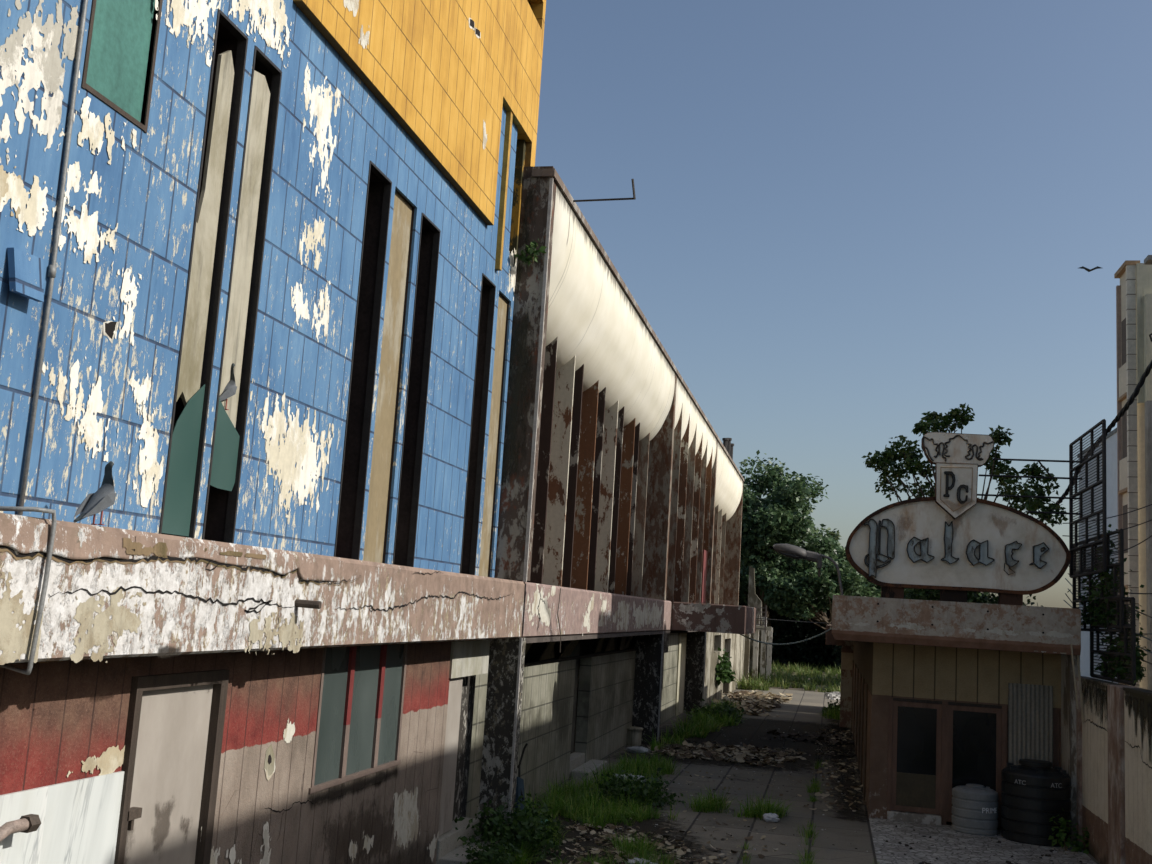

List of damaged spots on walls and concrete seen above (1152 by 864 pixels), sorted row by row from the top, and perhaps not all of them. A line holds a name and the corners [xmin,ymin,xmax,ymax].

peeling [155,0,294,68]
peeling [0,0,142,346]
peeling [299,62,341,271]
peeling [291,281,331,343]
peeling [250,378,334,518]
peeling [70,587,146,663]
crack [0,546,545,631]
peeling [245,612,304,655]
peeling [527,584,556,627]
damp [1082,681,1107,721]
damp [1124,690,1152,760]
peeling [67,745,125,777]